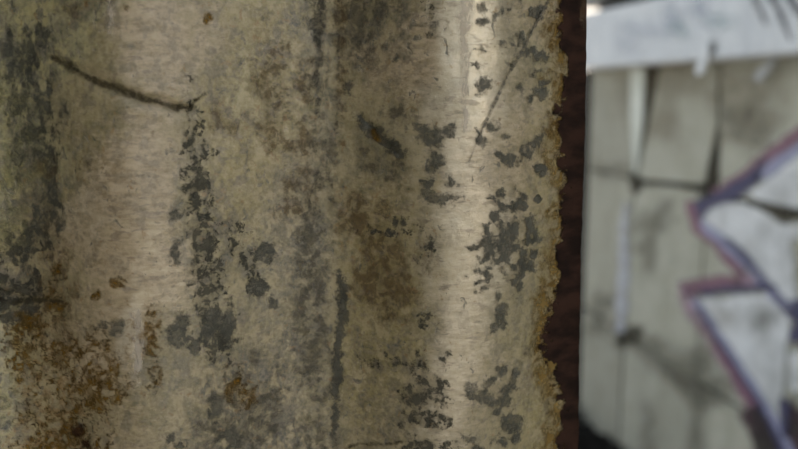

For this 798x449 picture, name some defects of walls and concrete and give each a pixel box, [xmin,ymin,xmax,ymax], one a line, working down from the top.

leakage [0,23,68,336]
corrosion [1,262,135,449]
corrosion [140,304,163,391]
leakage [178,99,273,365]
leakage [396,375,453,449]
corrosion [531,0,587,449]